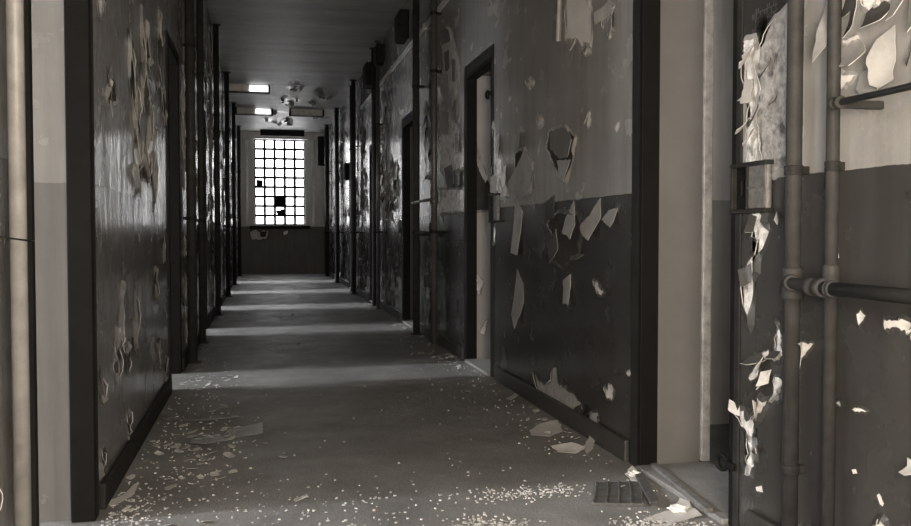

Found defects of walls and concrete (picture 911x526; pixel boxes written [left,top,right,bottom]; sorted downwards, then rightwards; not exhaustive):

peeling [556,0,615,57]
peeling [735,3,787,180]
peeling [812,1,828,62]
peeling [839,0,911,94]
peeling [477,121,534,255]
peeling [545,195,618,305]
peeling [738,212,778,334]
peeling [797,339,816,365]
spalling [856,308,867,327]
peeling [881,314,911,339]
peeling [728,318,783,481]
peeling [898,457,911,476]